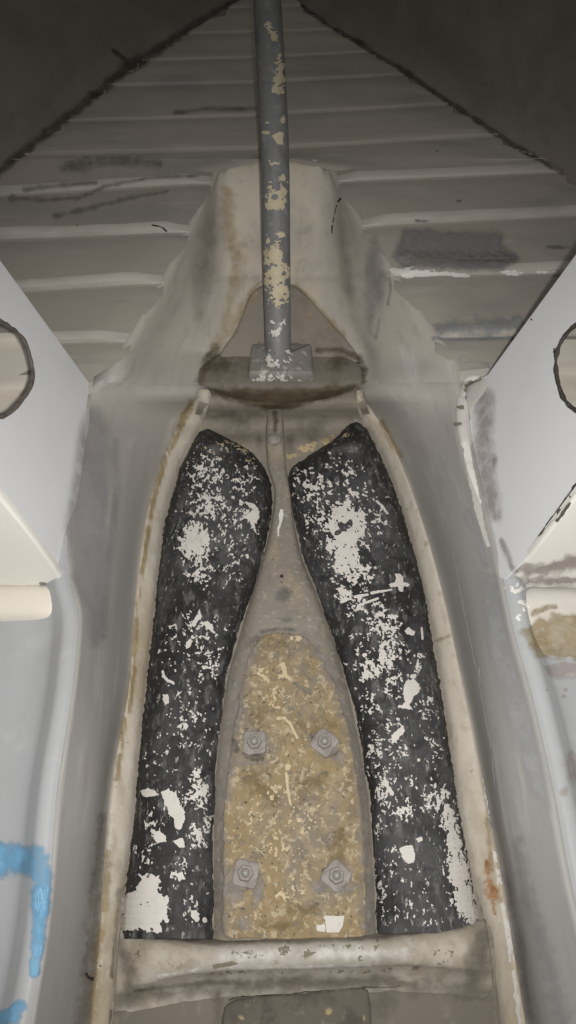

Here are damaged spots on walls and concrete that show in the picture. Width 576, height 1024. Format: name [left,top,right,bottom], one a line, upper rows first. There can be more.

peeling [264,21,286,94]
peeling [261,115,285,145]
peeling [262,160,288,211]
leakage [394,230,517,270]
peeling [263,231,290,337]
peeling [252,350,301,381]
peeling [503,583,540,621]